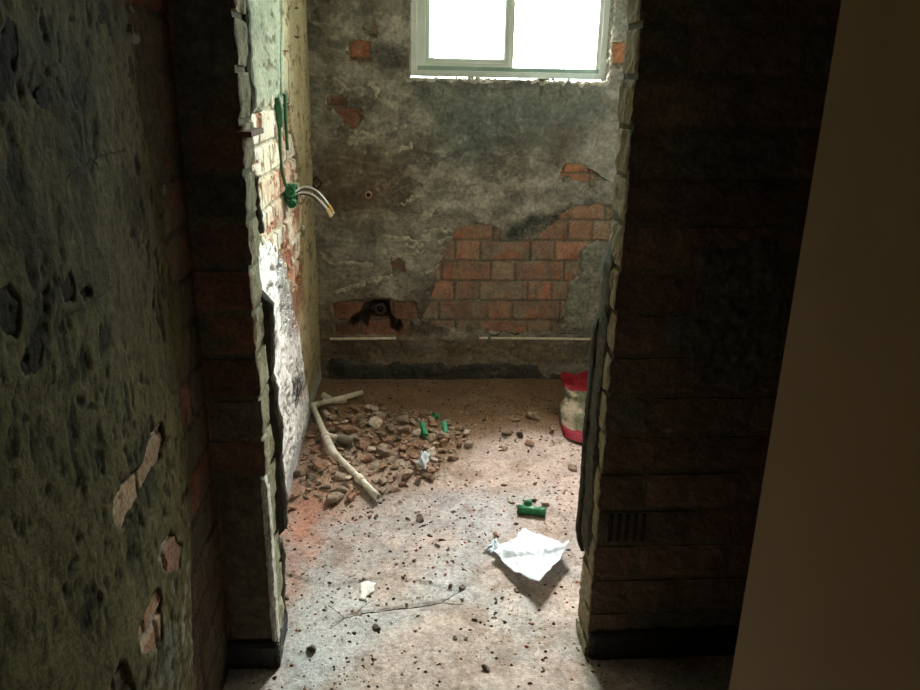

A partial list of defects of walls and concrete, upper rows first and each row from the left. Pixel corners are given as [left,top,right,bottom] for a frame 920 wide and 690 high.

spalling [346,22,377,65]
spalling [242,0,305,291]
spalling [326,93,365,133]
spalling [559,164,597,188]
leakage [277,261,296,338]
spalling [125,0,229,690]
leakage [292,371,303,403]
spalling [330,202,616,556]
spalling [112,424,162,527]